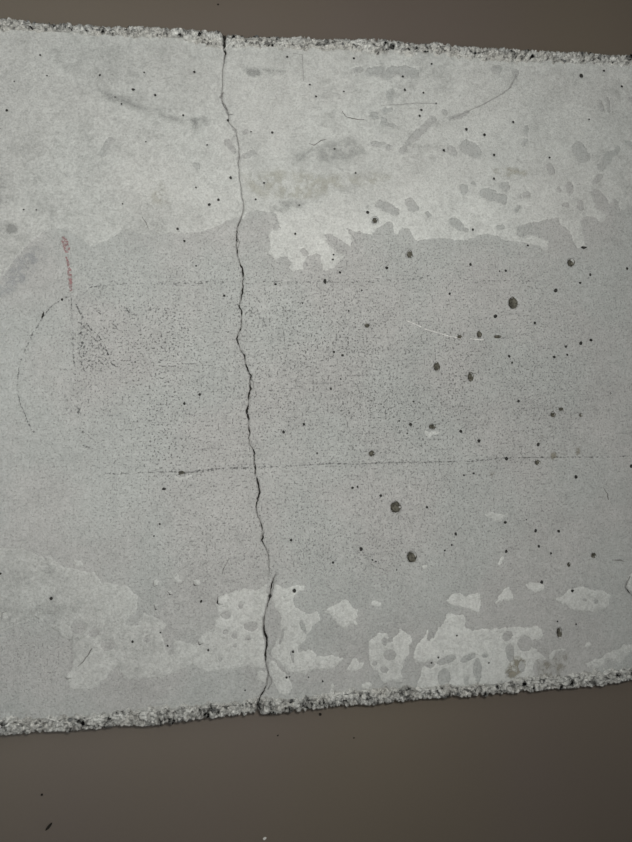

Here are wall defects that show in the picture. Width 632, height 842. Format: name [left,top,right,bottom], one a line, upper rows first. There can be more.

crack [221,35,277,709]